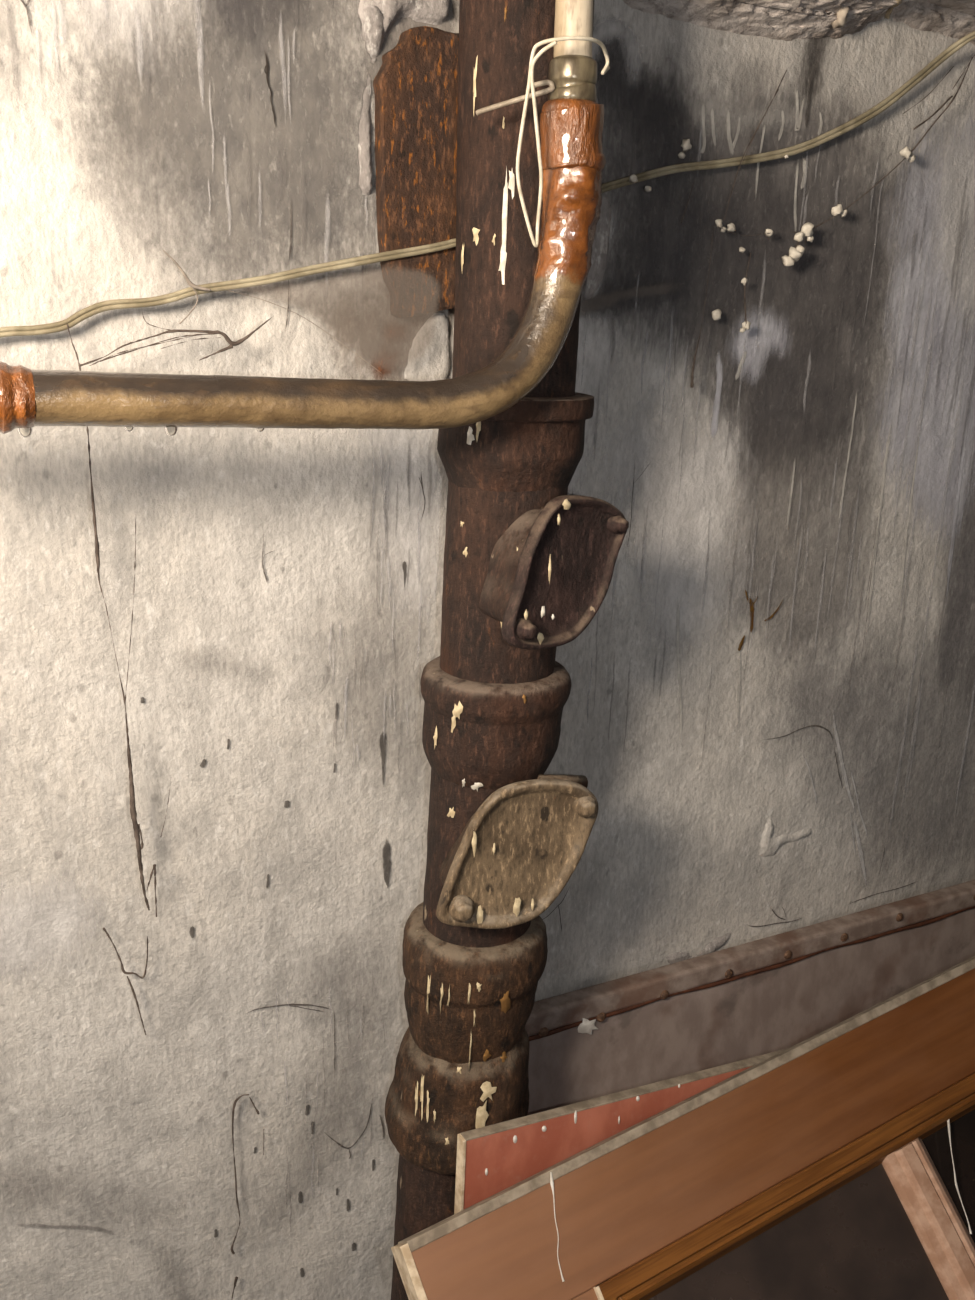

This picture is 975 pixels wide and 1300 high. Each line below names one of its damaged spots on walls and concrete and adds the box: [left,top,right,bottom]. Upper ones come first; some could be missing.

water stain [82,0,377,276]
flaking render [357,0,458,195]
water stain [568,22,975,738]